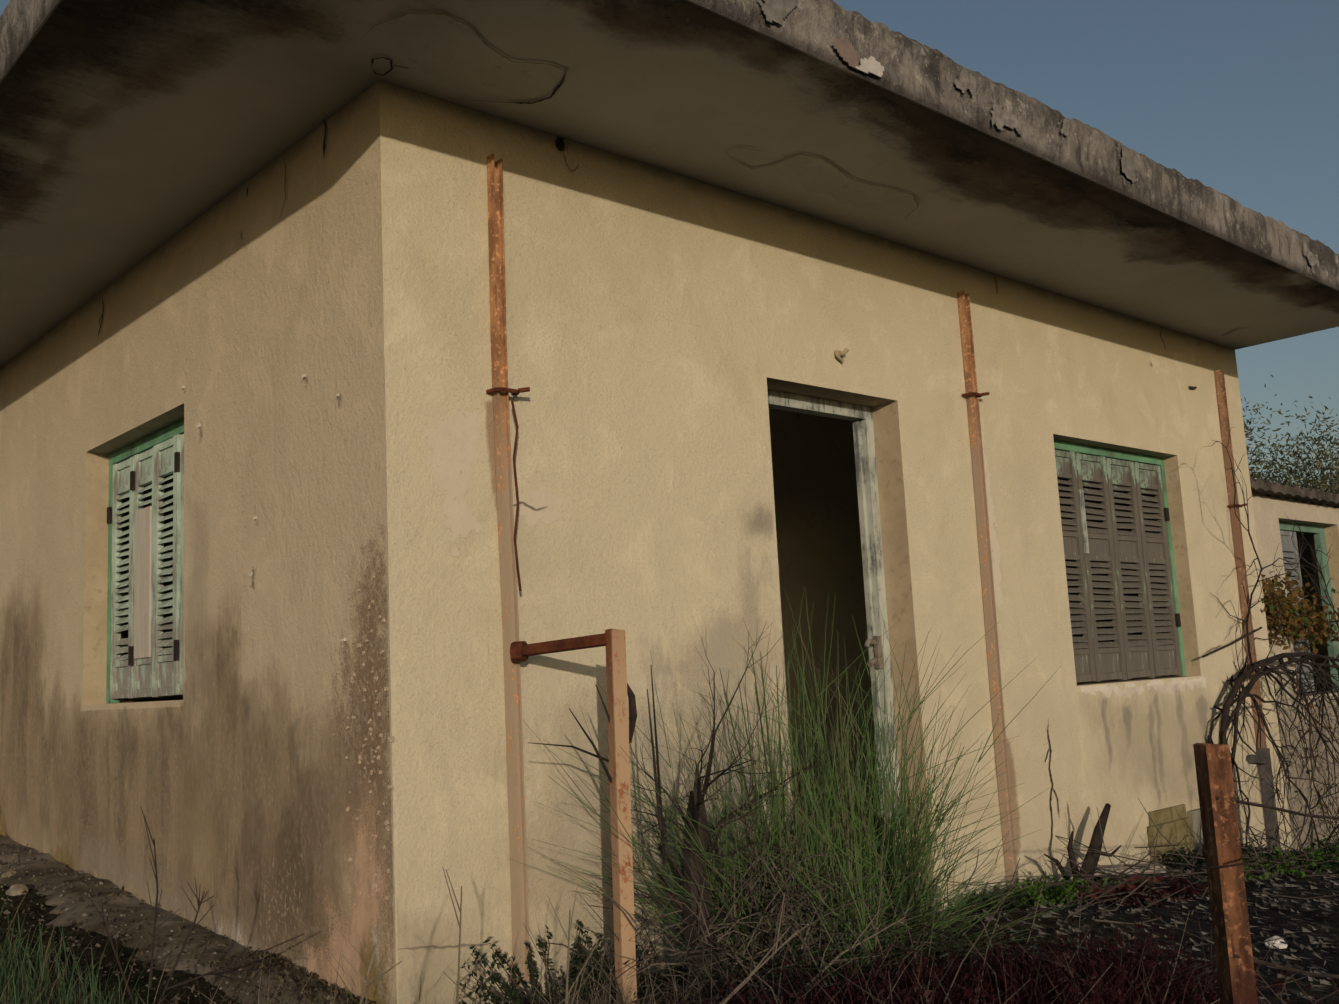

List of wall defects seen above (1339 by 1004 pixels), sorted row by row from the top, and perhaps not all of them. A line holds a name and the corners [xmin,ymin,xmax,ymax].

water stain [0,0,318,208]
water stain [586,0,1339,305]
spalling [954,67,977,101]
spalling [991,102,1023,135]
spalling [1121,146,1137,183]
water stain [0,610,192,911]
water stain [201,637,360,965]